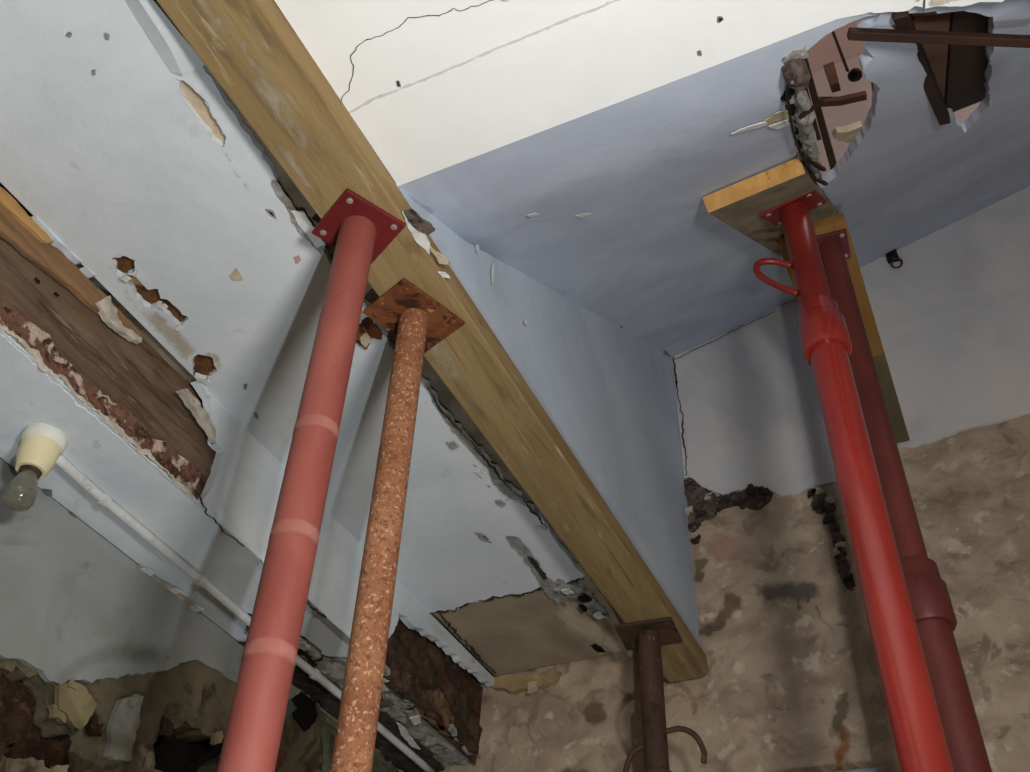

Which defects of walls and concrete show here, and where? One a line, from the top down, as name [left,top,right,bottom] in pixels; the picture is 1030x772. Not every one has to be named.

peeling [181,80,226,143]
crack [341,0,508,102]
spalling [731,45,828,186]
spalling [832,121,862,143]
spalling [0,187,216,499]
spalling [0,657,236,772]
spalling [276,635,347,772]
spalling [374,536,644,772]
spalling [663,477,900,772]
spalling [898,415,1030,772]